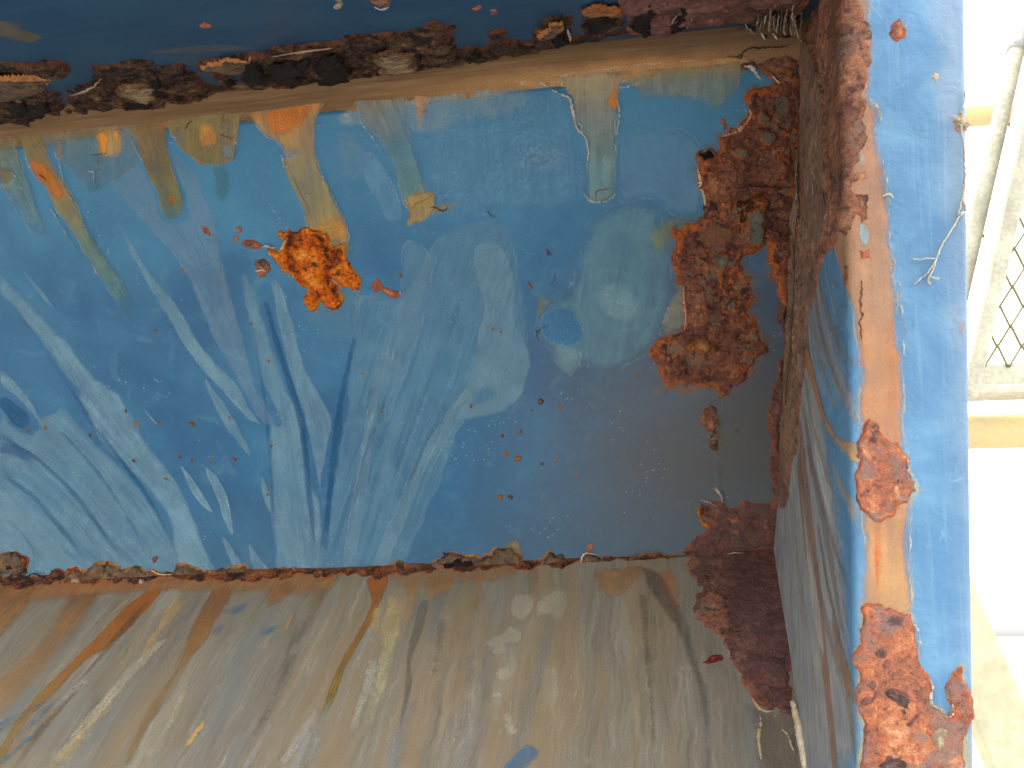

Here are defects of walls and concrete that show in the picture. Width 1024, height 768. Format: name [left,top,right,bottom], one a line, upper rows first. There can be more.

peeling [745,5,803,42]
rust [0,103,362,312]
leakage [169,309,243,411]
rust [535,0,975,768]
rust [0,500,793,768]